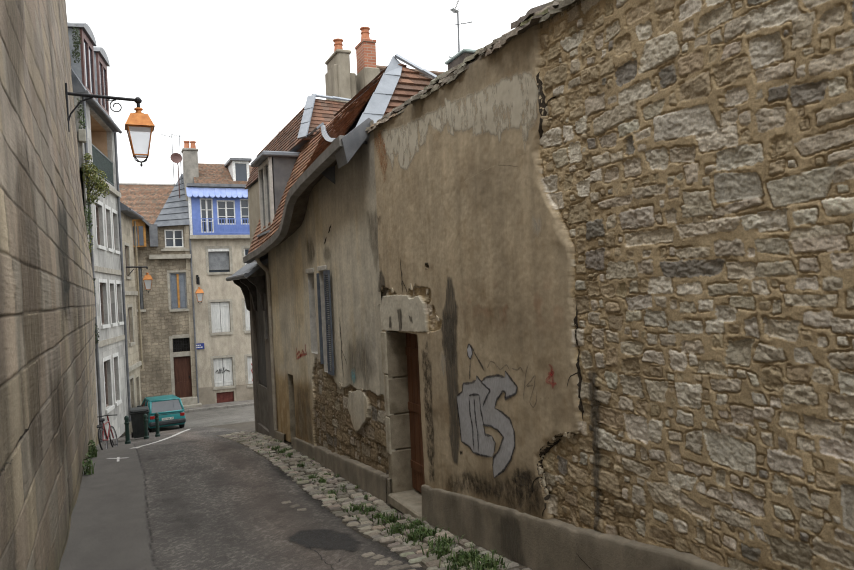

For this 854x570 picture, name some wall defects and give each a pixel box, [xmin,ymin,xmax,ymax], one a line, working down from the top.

spalling [380,283,442,333]
spalling [312,359,389,481]
spalling [537,424,596,530]